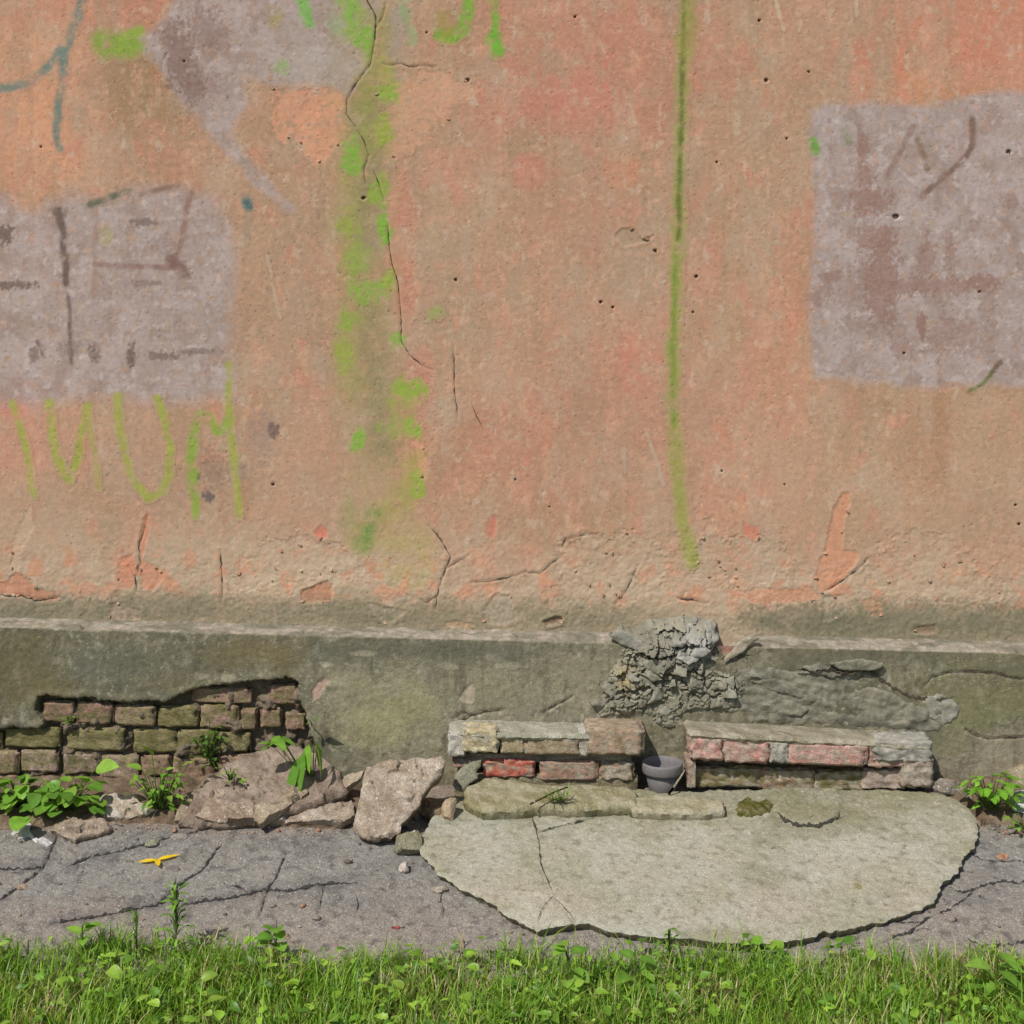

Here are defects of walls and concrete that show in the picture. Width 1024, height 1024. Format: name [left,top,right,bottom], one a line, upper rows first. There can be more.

crack [346,0,433,196]
crack [387,227,422,365]
crack [421,529,467,606]
crack [477,534,583,582]
spalling [693,491,860,605]
spalling [0,666,328,780]